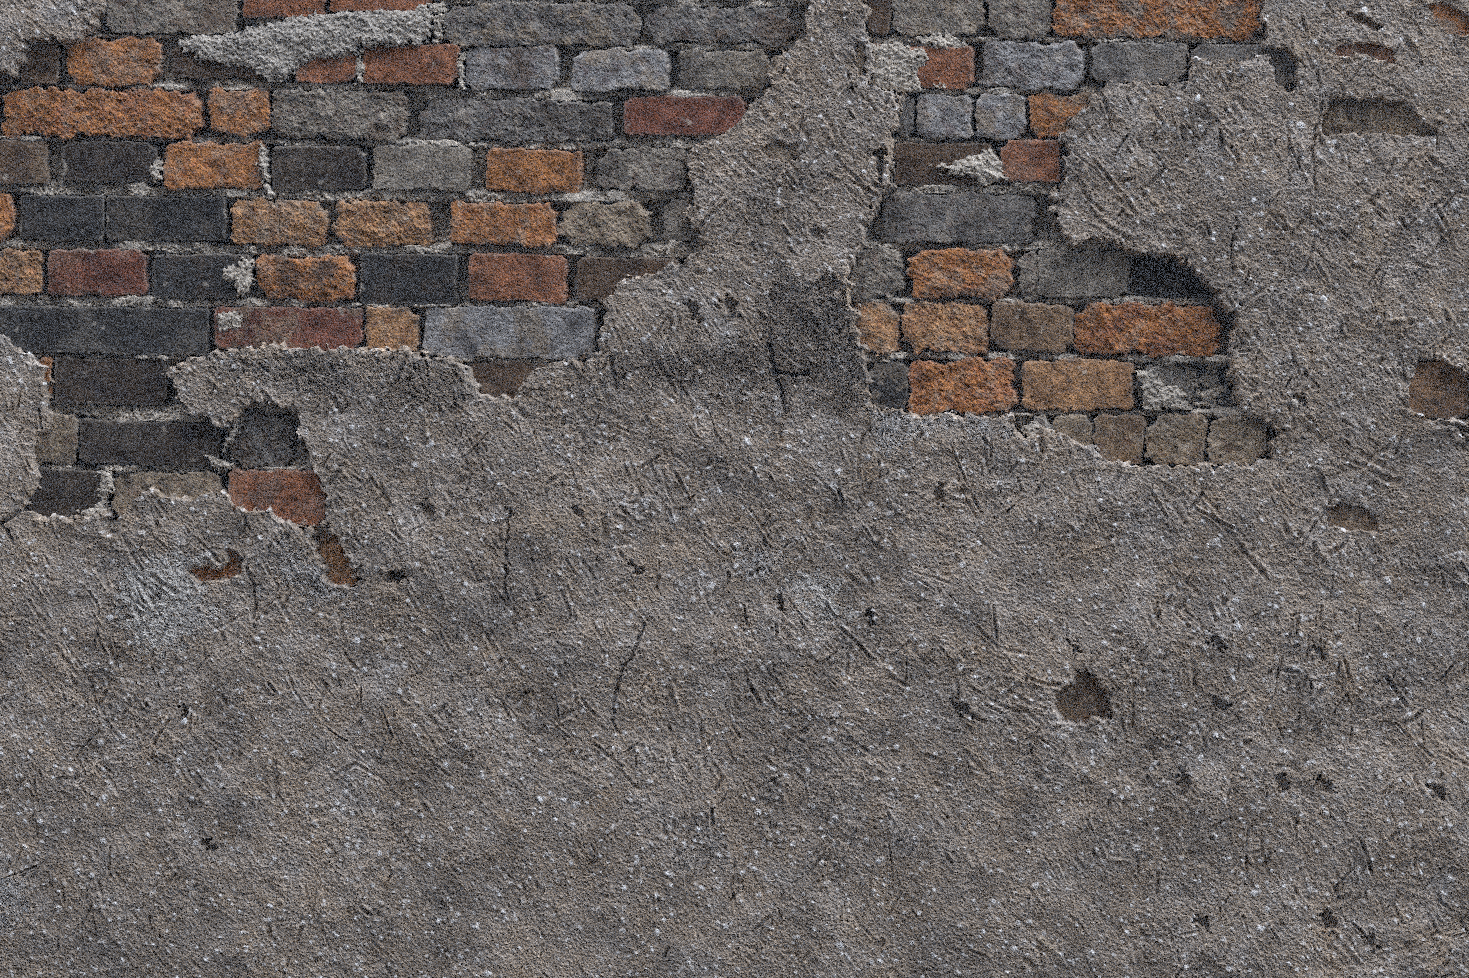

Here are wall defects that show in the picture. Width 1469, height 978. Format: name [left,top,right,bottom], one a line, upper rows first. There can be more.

spalling [0,0,810,590]
spalling [843,0,1302,473]
spalling [1407,356,1469,425]
spalling [1051,639,1115,727]